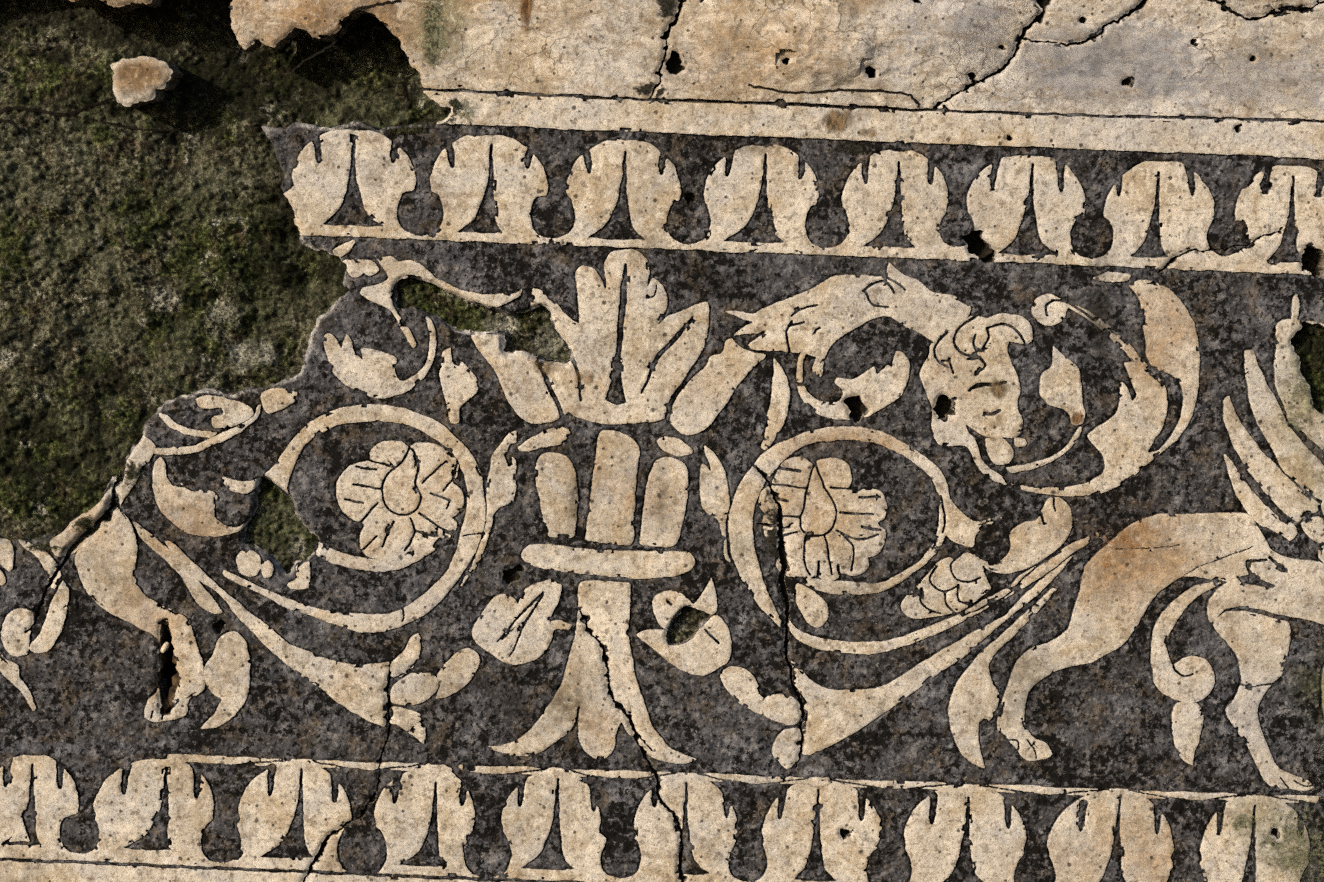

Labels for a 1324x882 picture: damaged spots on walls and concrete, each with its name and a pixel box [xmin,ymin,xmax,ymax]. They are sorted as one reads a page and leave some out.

crack [650,0,704,98]
crack [748,0,1147,108]
crack [1207,0,1324,21]
peeling [0,0,451,557]
peeling [1290,322,1324,413]
peeling [244,477,319,574]
spalling [213,619,226,634]
crack [756,465,805,767]
crack [303,663,416,882]
crack [579,608,686,882]